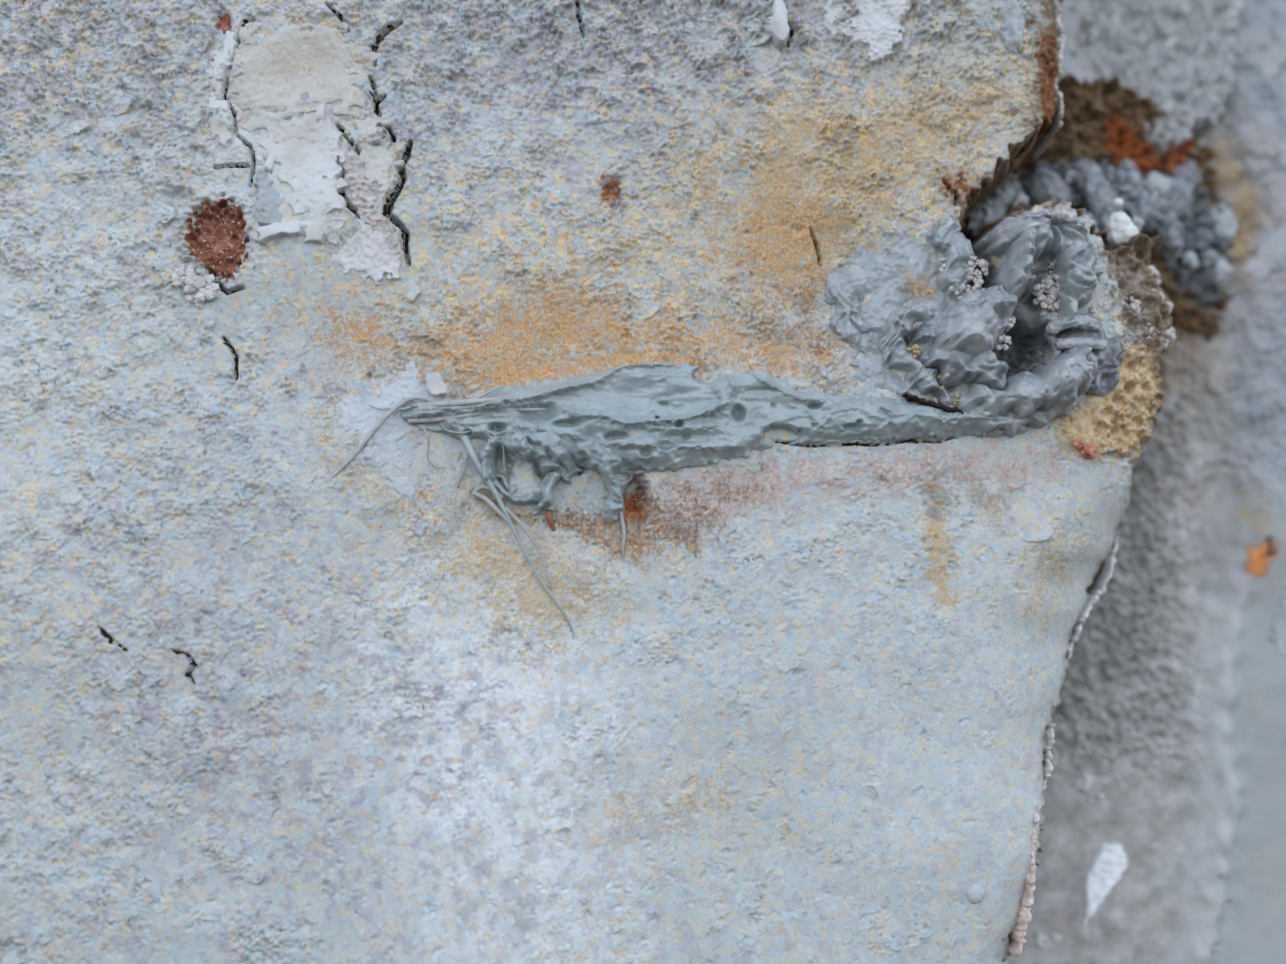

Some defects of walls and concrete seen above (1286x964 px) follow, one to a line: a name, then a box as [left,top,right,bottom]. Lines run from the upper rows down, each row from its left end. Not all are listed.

peeling [200,17,422,304]
corrosion [1098,111,1194,179]
corrosion [182,197,249,285]
corrosion [297,28,1164,694]
corrosion [1244,539,1278,577]